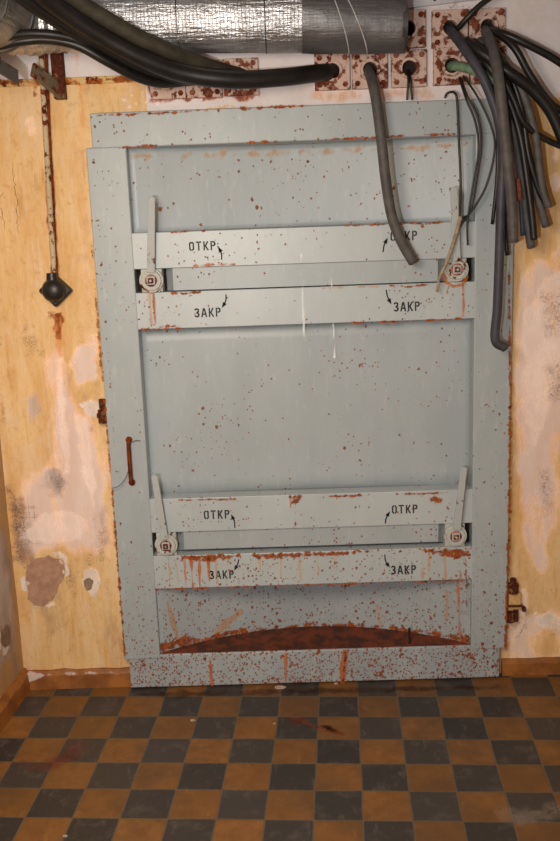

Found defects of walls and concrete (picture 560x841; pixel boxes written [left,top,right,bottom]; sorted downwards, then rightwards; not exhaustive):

corrosion [138,274,181,331]
water stain [48,469,64,493]
corrosion [473,294,512,677]
flaking render [21,551,69,609]
flaking render [84,560,101,598]
corrosion [155,553,250,590]
corrosion [252,550,369,559]
corrosion [412,531,471,607]
corrosion [151,621,365,652]
corrosion [390,617,470,643]
corrosion [333,650,348,683]